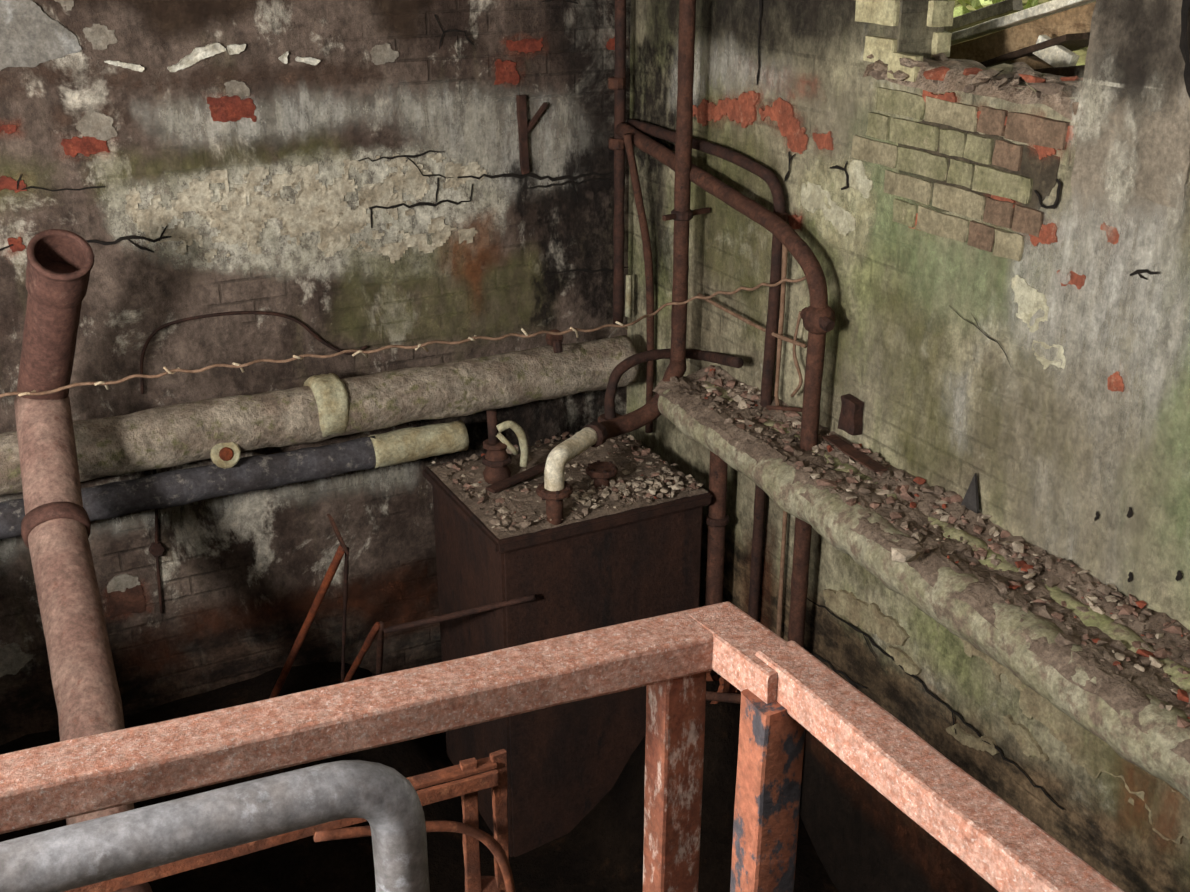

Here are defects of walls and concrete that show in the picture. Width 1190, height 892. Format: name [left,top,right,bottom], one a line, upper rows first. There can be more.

peeling [54,0,74,11]
flaking render [0,24,380,138]
flaking render [54,109,110,157]
flaking render [0,176,27,193]
crack [86,226,172,253]
damp [105,94,614,280]
crack [358,150,614,228]
flaking render [693,60,1075,369]
crack [804,598,1064,810]